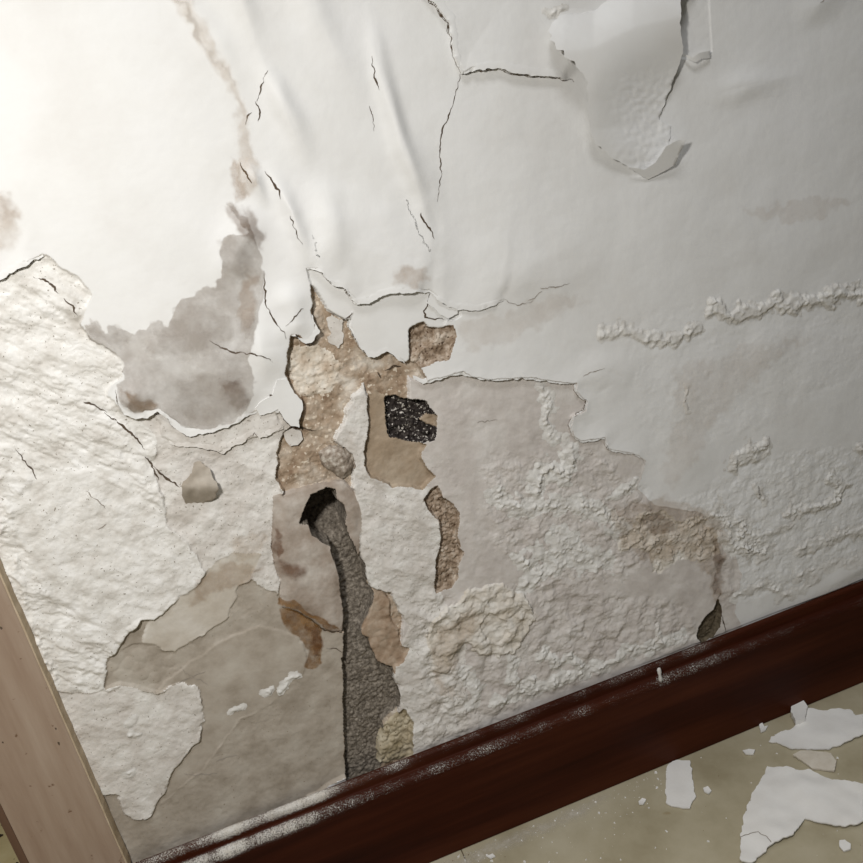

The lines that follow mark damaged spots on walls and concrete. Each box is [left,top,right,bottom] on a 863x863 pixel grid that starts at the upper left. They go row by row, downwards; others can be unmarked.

crack [245,71,268,125]
crack [240,163,280,196]
crack [438,79,460,194]
peeling [548,0,713,179]
crack [263,279,301,337]
flaking render [0,254,824,863]